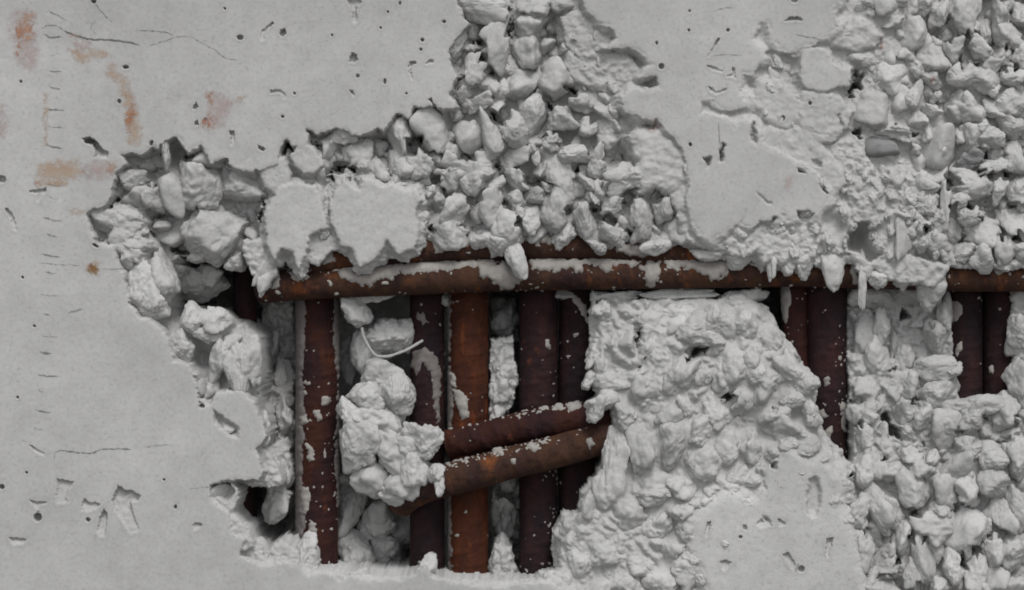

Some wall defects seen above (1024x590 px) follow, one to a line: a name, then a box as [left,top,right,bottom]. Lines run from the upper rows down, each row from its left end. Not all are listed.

crack [41,6,185,45]
spalling [344,0,365,28]
spalling [781,15,806,25]
spalling [80,135,111,162]
spalling [934,268,1024,398]
spalling [166,232,920,590]